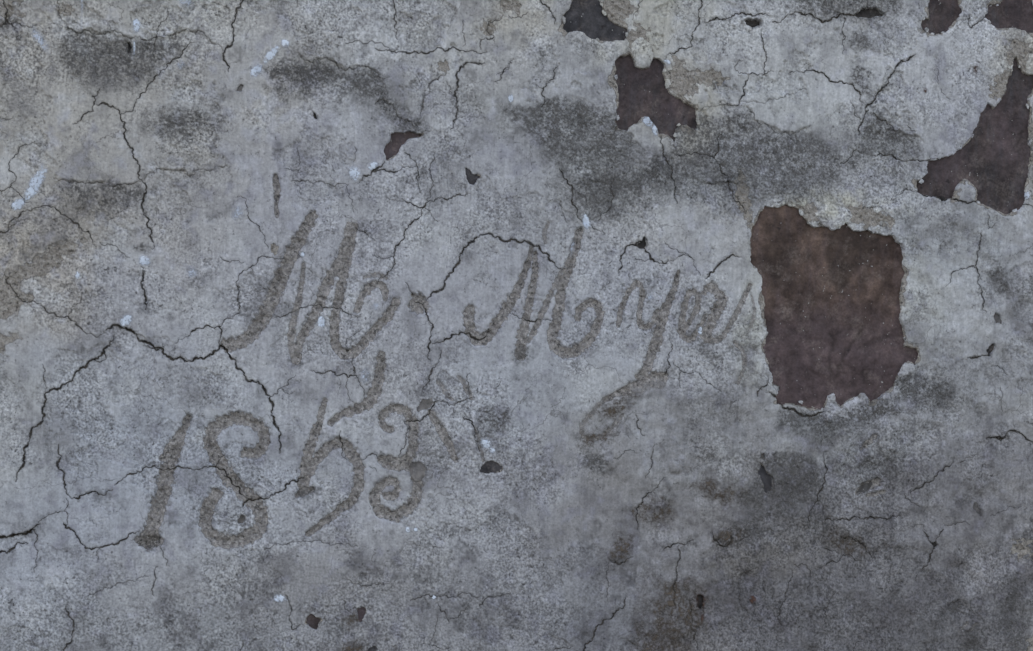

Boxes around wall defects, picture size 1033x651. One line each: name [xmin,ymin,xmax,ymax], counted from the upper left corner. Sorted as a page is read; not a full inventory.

flaking render [384,132,424,161]
crack [346,0,558,130]
flaking render [558,0,731,141]
crack [668,0,938,164]
flaking render [911,0,1033,216]
crack [0,0,365,482]
crack [286,147,559,472]
crack [619,241,738,279]
flaking render [734,170,920,411]
crack [899,189,995,313]
crack [0,444,308,570]
crack [730,355,1030,625]